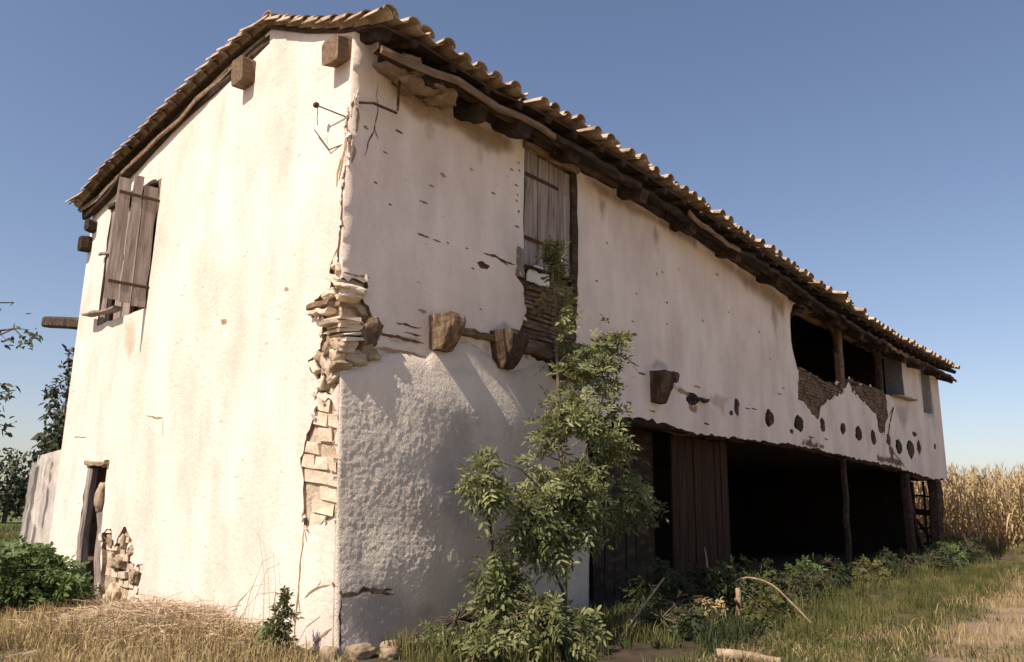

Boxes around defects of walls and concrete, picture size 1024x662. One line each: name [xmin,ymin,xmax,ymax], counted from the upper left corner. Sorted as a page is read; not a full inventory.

spalling [299,261,384,529]
spalling [797,367,888,435]
spalling [97,529,143,604]
crack [290,530,394,648]